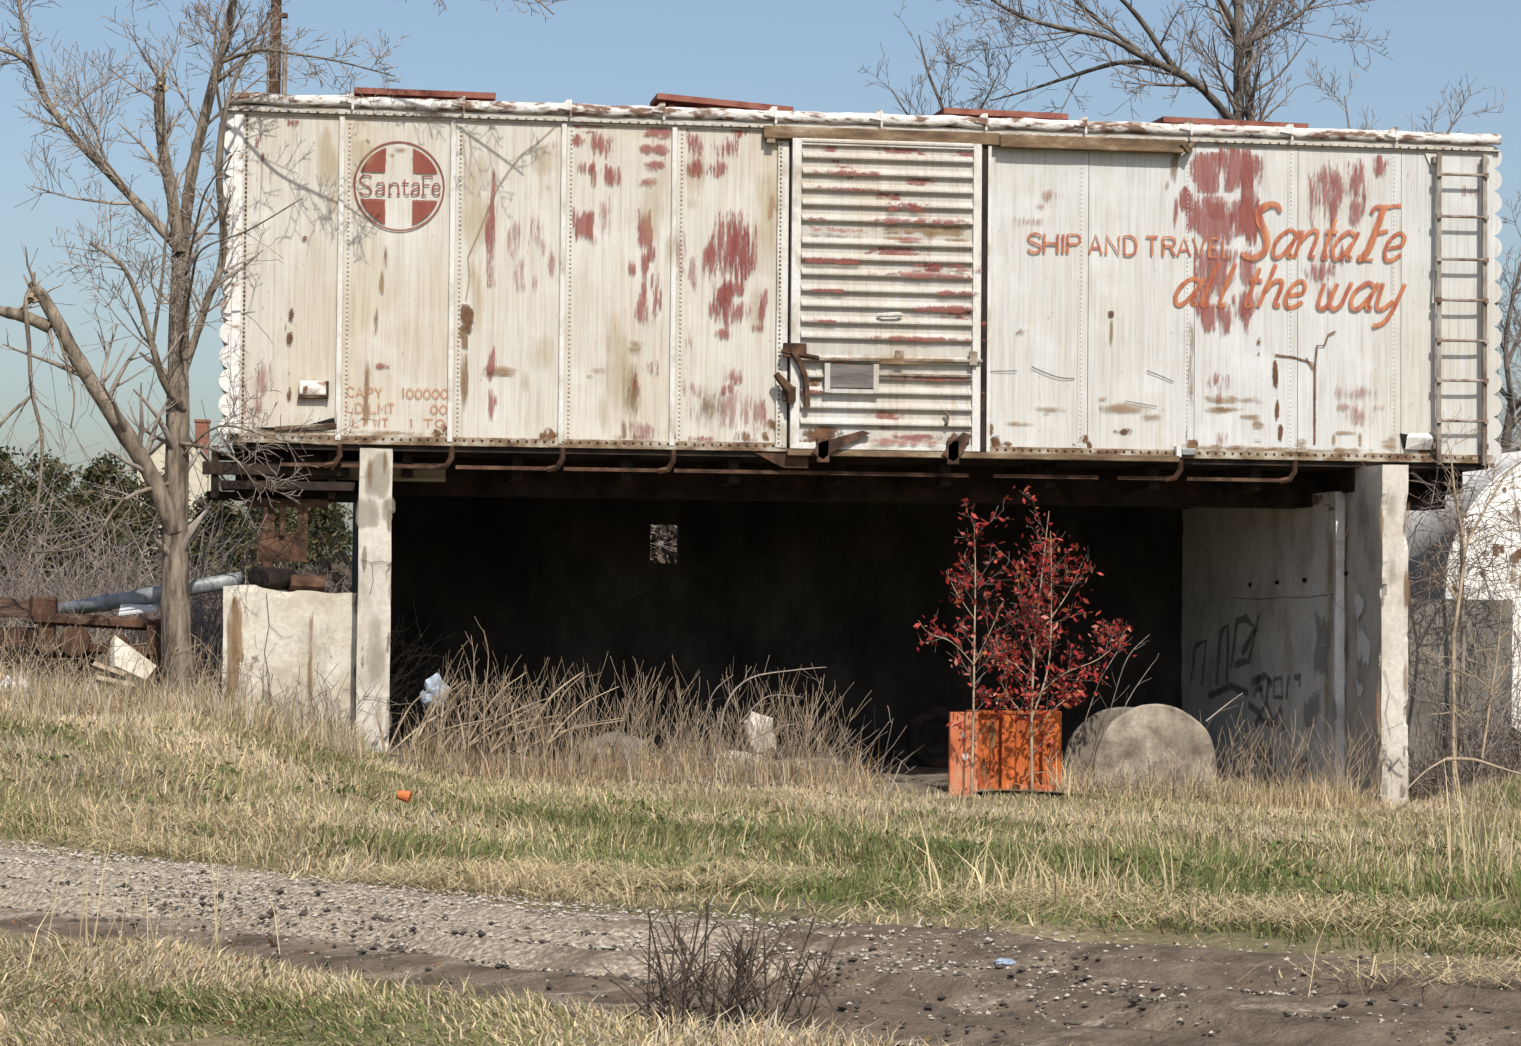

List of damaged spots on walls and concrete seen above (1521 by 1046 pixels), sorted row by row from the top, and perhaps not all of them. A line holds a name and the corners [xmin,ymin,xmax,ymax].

peeling [572,125,744,187]
peeling [572,207,594,241]
peeling [628,209,662,322]
peeling [703,206,768,340]
peeling [800,146,986,342]
peeling [1173,148,1263,334]
peeling [1302,154,1389,299]
rust [459,304,474,403]
rust [539,428,558,439]
rust [799,426,843,443]
peeling [867,411,954,446]
peeling [891,377,985,409]